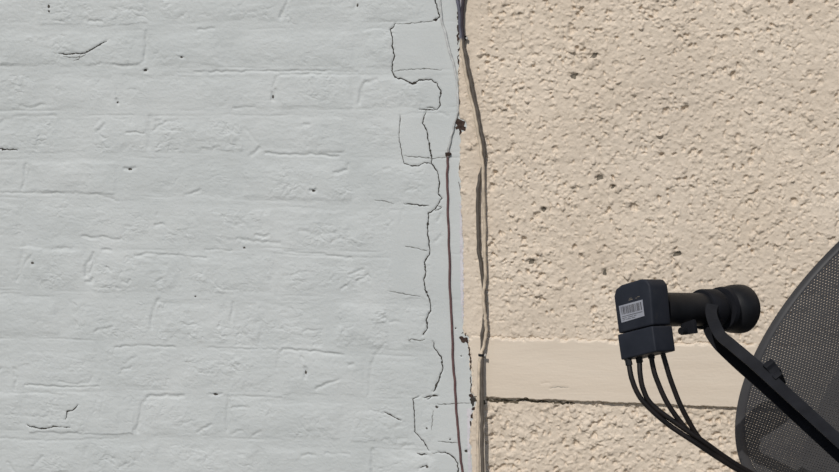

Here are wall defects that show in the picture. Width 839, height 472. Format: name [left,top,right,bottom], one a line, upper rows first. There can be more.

crack [61,42,104,61]
peeling [455,328,476,472]
crack [28,405,78,429]